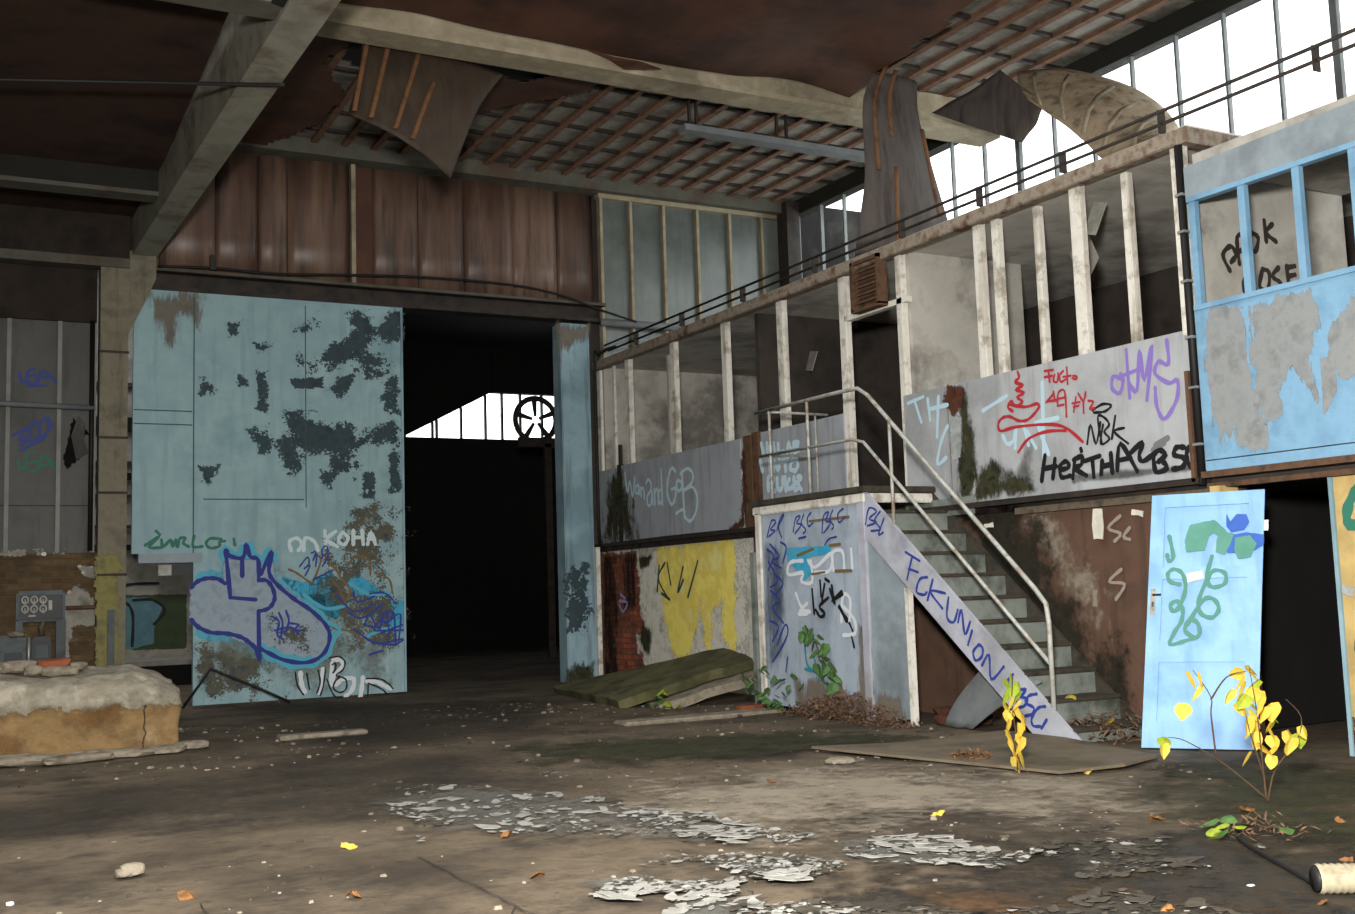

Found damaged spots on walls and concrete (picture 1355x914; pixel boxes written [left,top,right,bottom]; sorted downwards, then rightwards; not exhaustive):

corrosion [154,291,201,347]
peeling [1204,288,1355,452]
leakage [1073,470,1150,483]
peeling [187,307,417,704]
spalling [0,548,65,557]
leakage [1033,518,1063,560]
peeling [64,551,124,666]
peeling [563,538,751,674]
leakage [1067,572,1094,602]